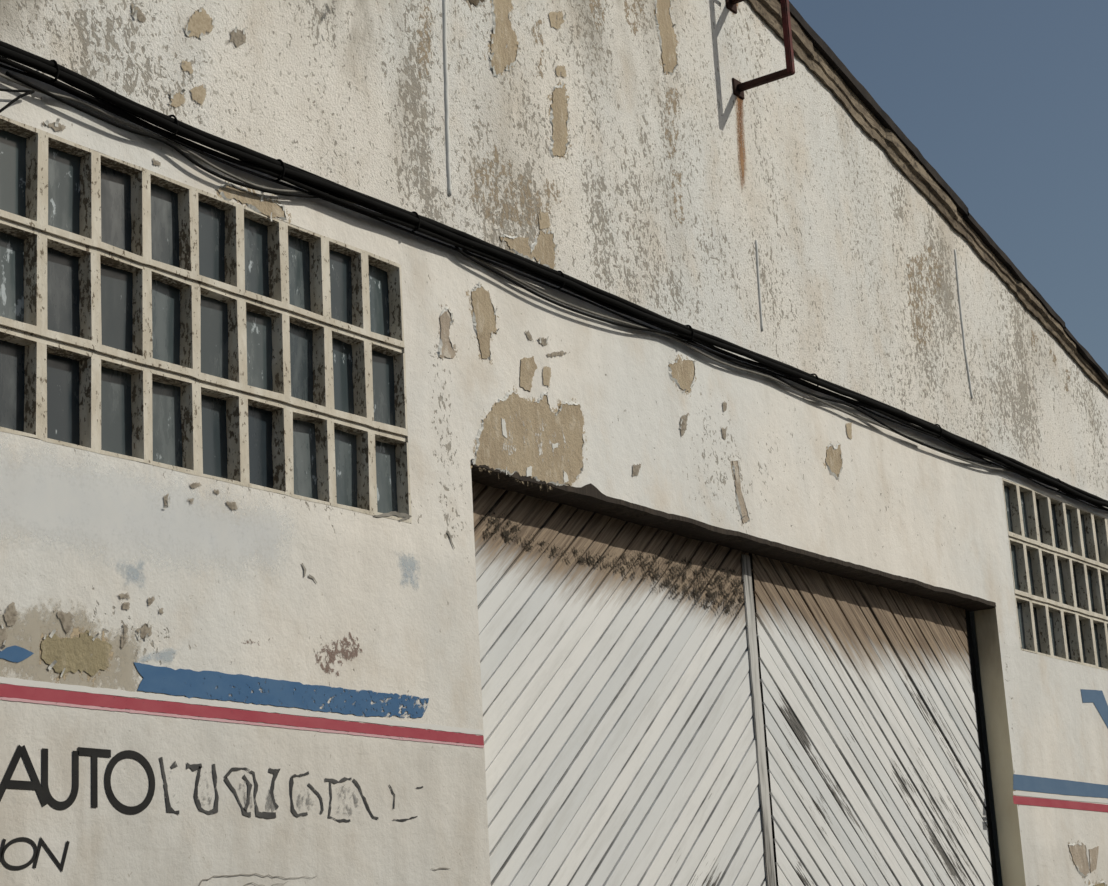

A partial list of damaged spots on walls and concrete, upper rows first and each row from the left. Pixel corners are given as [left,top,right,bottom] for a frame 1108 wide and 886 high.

peeling [466,0,520,78]
peeling [654,0,678,75]
peeling [548,65,570,158]
corrosion [736,97,746,185]
peeling [437,305,458,360]
peeling [466,282,499,363]
peeling [471,330,588,489]
peeling [668,354,696,394]
leakage [481,509,745,618]
peeling [39,610,152,686]
crack [199,873,317,886]
peeling [1068,840,1107,886]